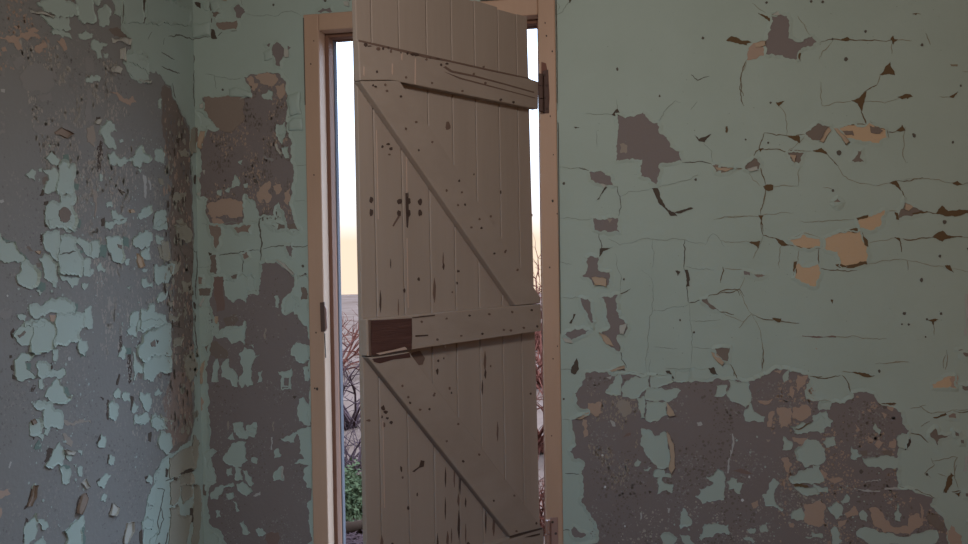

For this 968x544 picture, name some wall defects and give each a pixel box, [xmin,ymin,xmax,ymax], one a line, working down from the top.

peeling [762,1,833,64]
peeling [586,109,685,189]
crack [443,0,968,379]
peeling [0,0,318,544]
peeling [557,252,631,355]
peeling [790,195,927,291]
peeling [563,344,953,544]